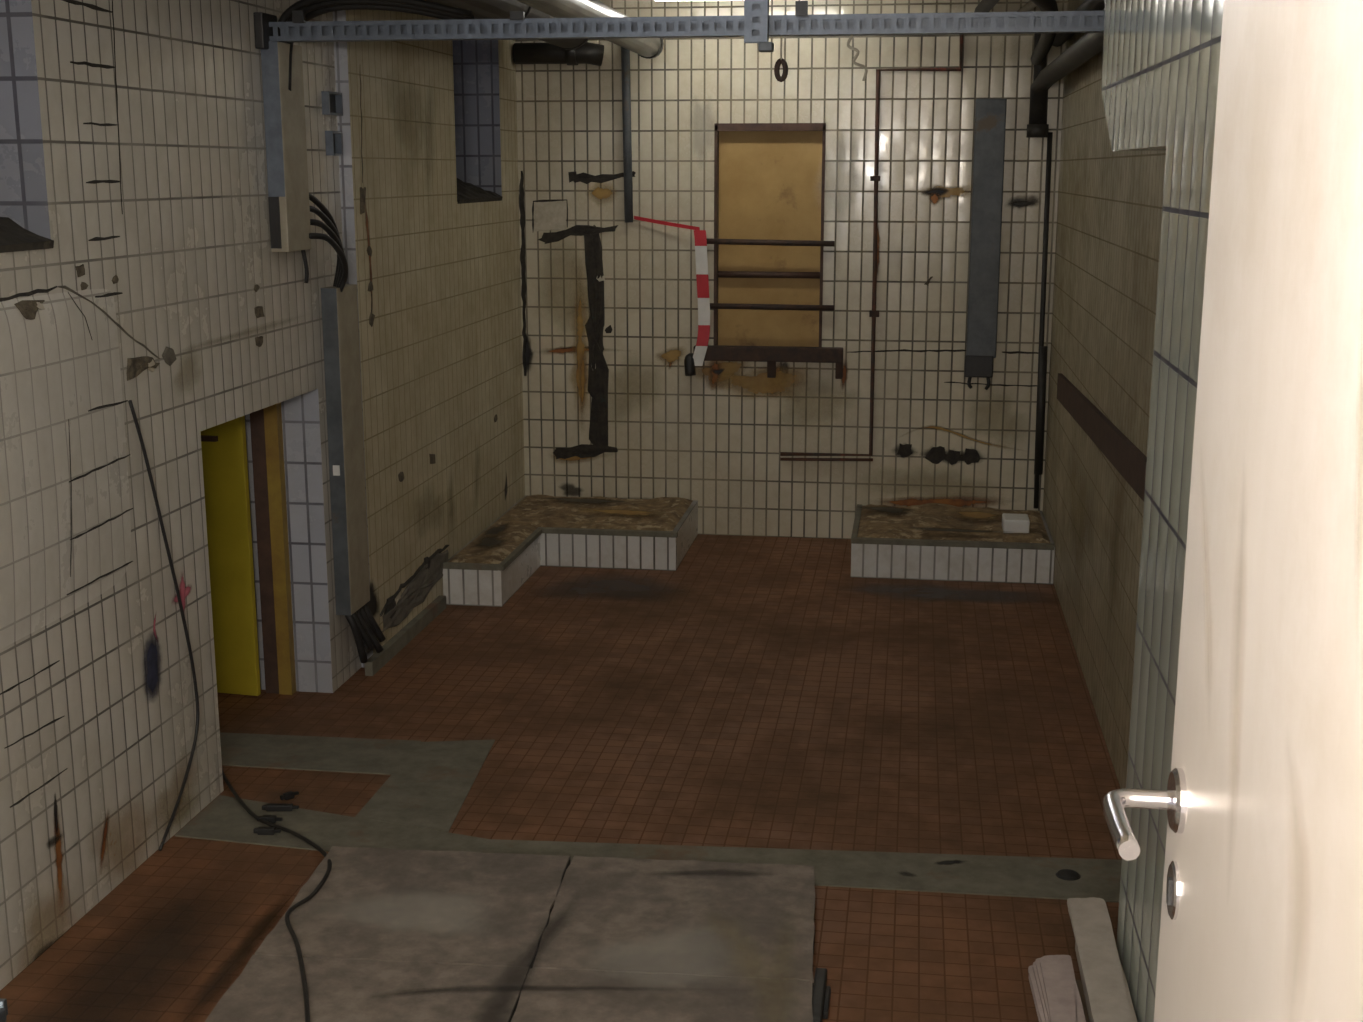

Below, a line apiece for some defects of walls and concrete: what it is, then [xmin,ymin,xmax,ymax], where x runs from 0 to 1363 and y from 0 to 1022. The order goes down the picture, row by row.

crack [62,0,123,241]
crack [0,286,160,359]
rust [547,299,589,405]
rust [700,361,798,395]
spalling [380,545,449,633]
rust [48,797,63,899]